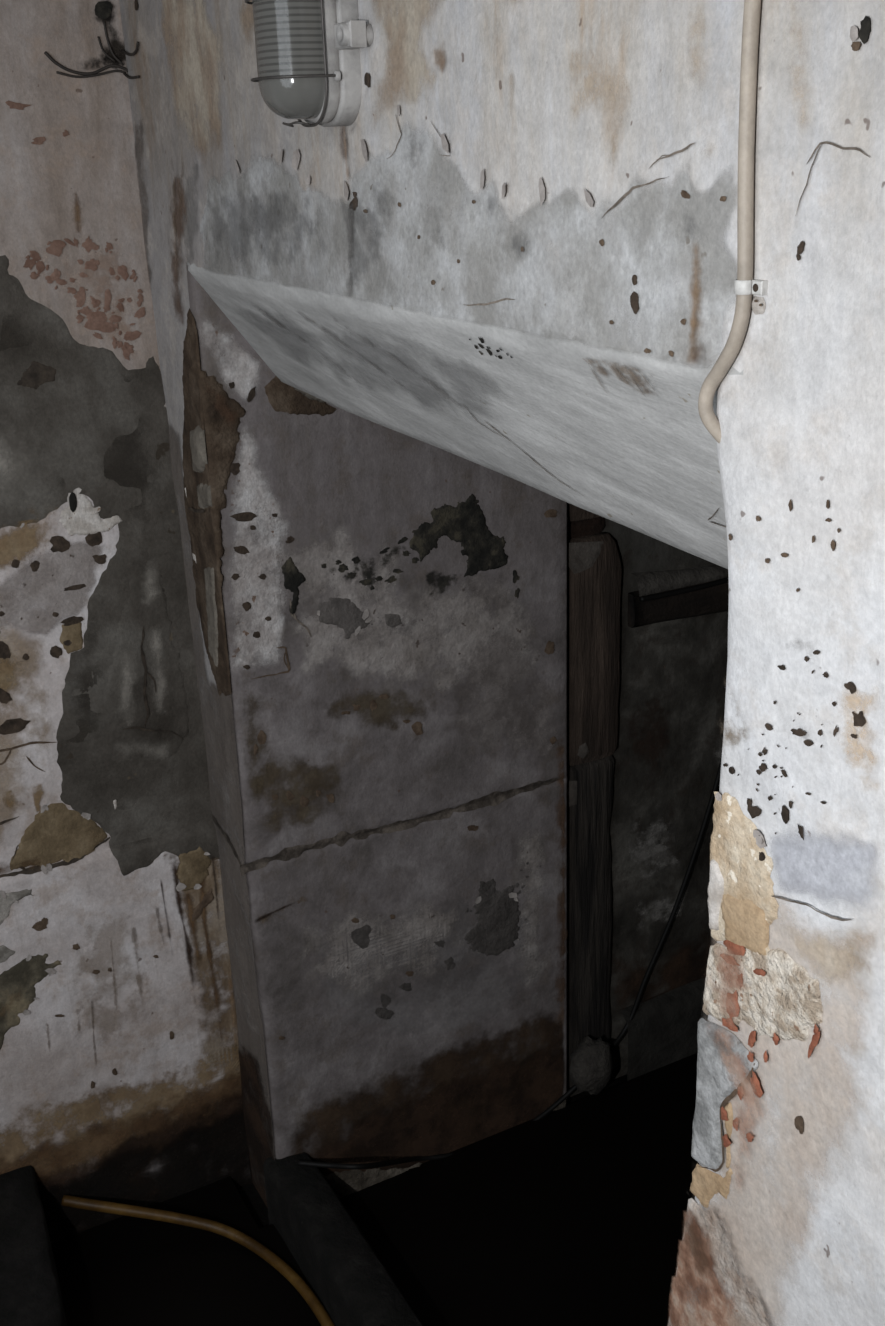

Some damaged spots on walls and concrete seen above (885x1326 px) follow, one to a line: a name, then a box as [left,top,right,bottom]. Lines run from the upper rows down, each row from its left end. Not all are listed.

spalling [0,236,554,925]
peeling [0,945,62,1049]
spalling [32,918,48,931]
water stain [0,427,339,1244]
crack [212,777,565,875]
peeling [304,835,545,1020]
water stain [292,1016,564,1176]
peeling [690,792,858,1316]